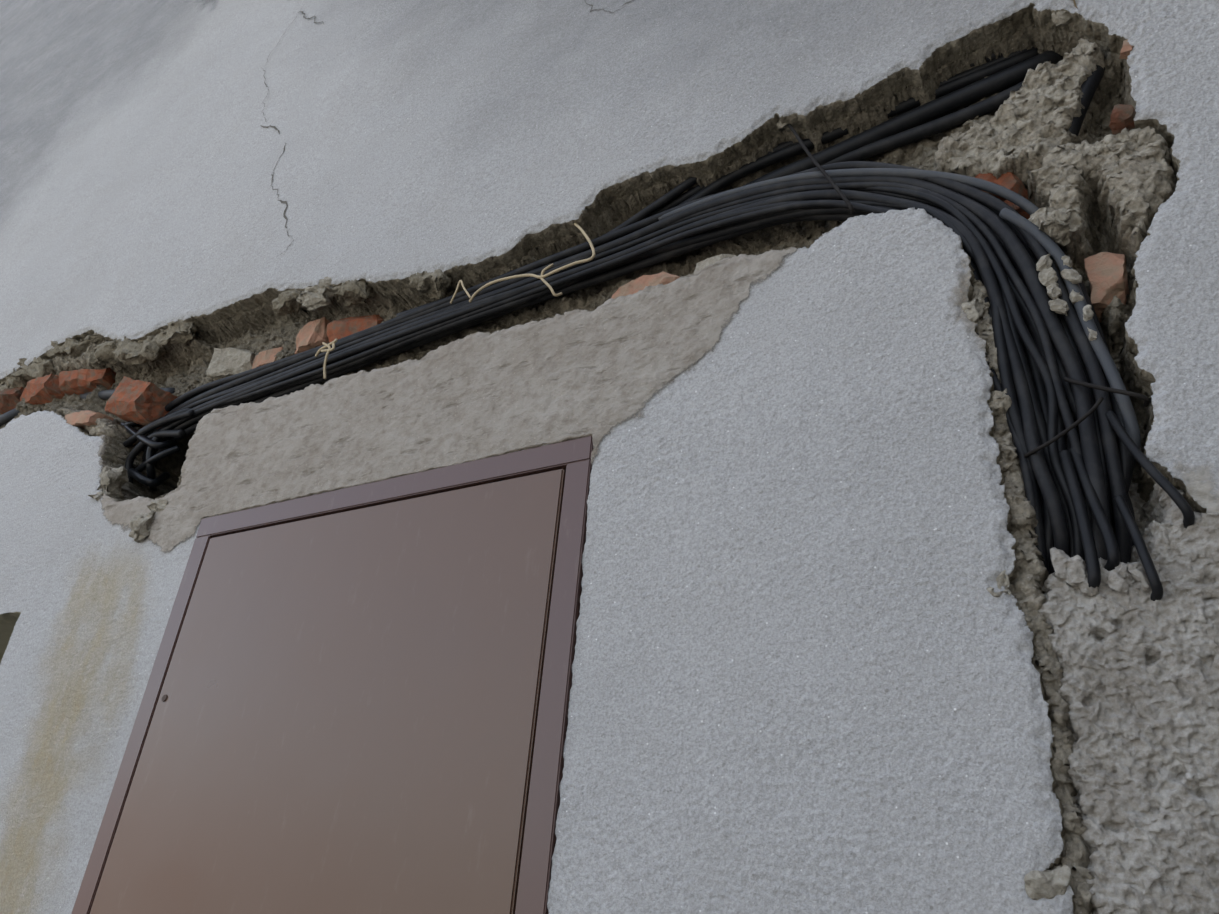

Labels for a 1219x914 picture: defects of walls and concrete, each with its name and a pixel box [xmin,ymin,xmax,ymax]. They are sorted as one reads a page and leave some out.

crack [260,11,324,257]
spalling [0,10,1177,553]
spalling [961,278,1152,914]